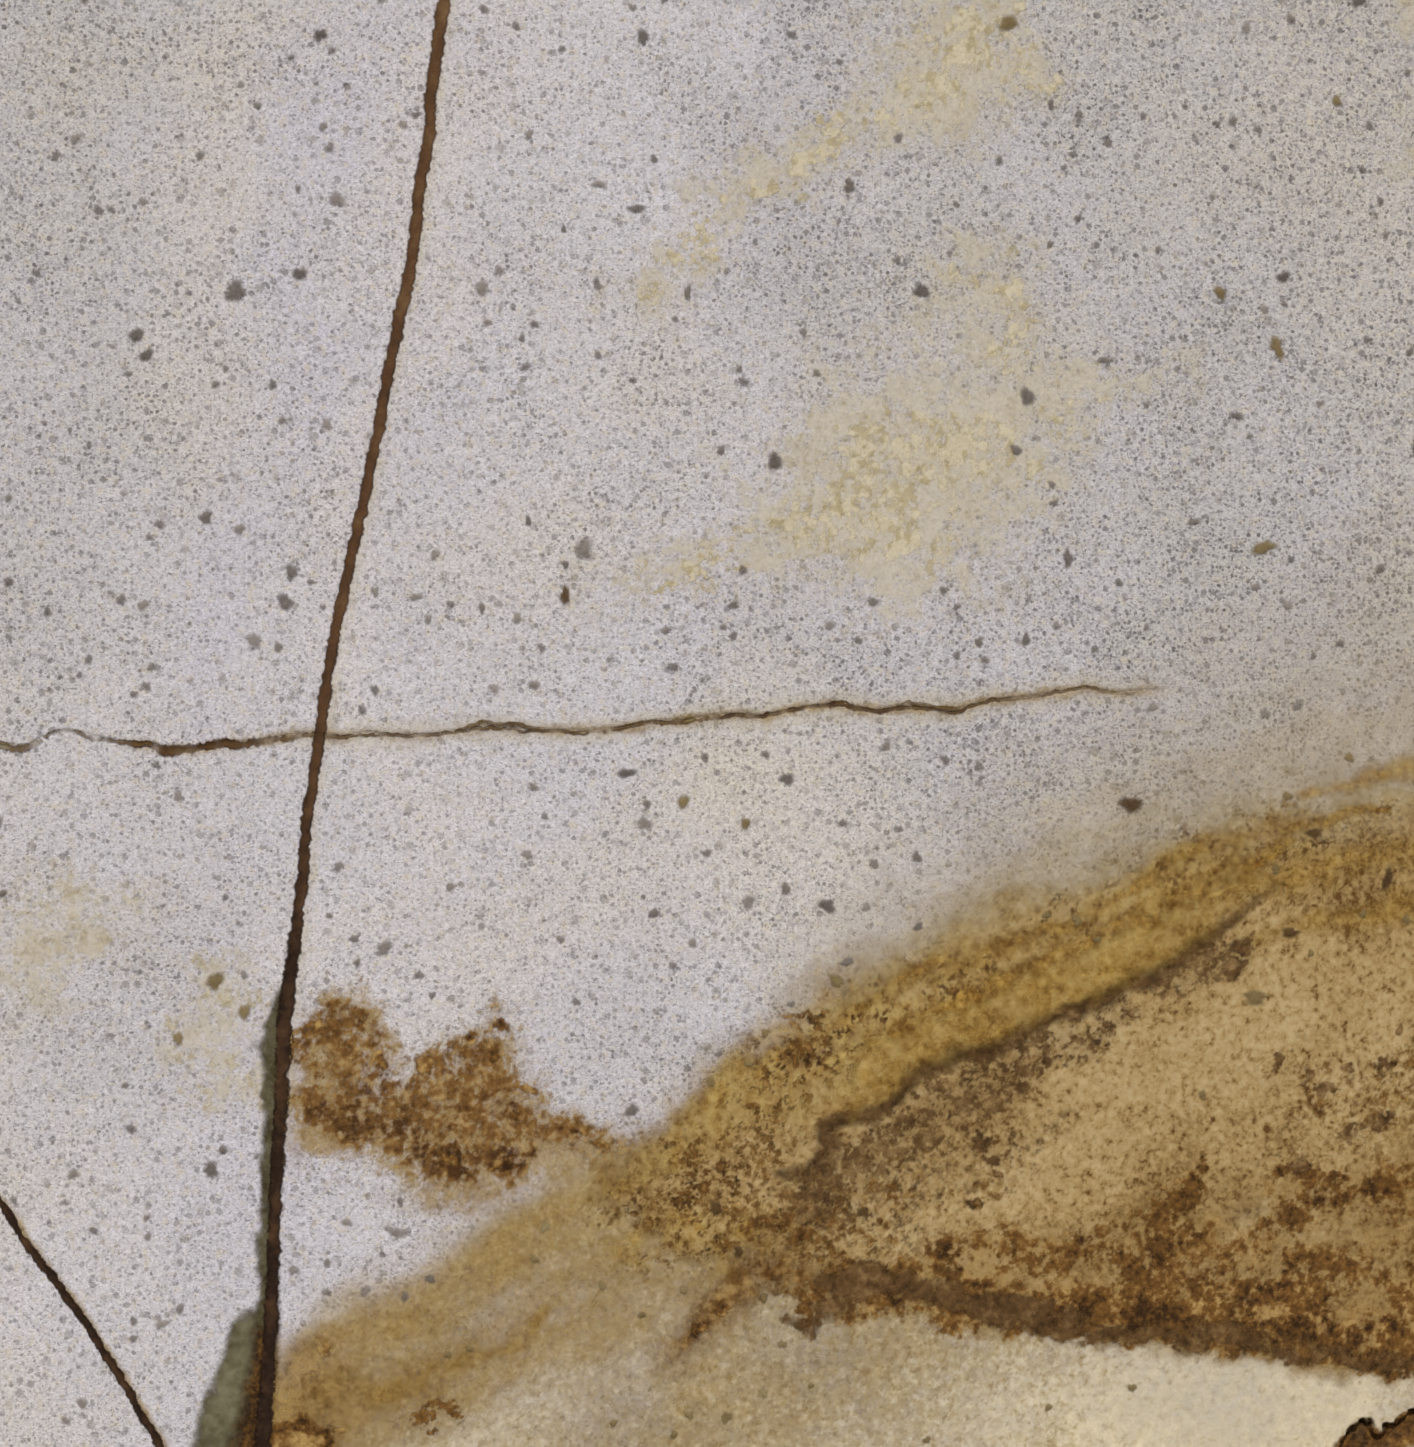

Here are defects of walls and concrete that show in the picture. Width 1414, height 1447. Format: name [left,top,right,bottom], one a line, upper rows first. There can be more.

crack [0,0,1113,1447]
leakage [167,762,1414,1447]
crack [1335,1409,1414,1447]